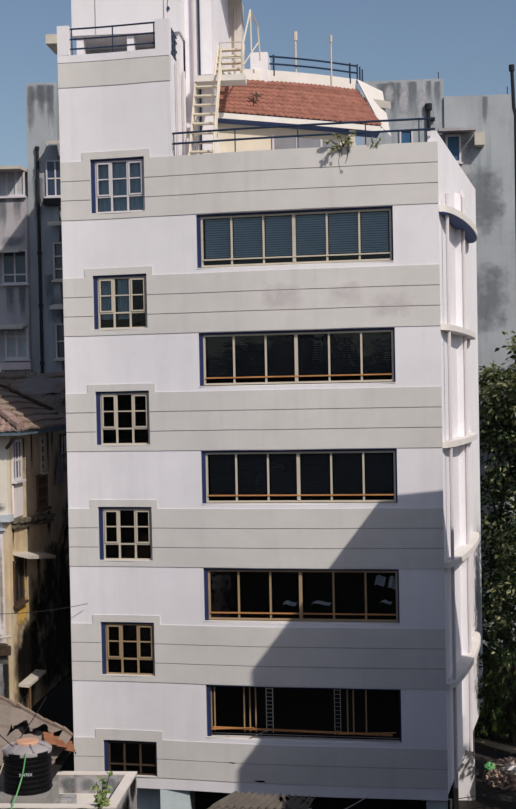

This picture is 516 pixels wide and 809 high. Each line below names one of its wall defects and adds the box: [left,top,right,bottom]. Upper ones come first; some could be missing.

damp [385,87,427,118]
damp [3,502,72,708]
damp [123,777,136,809]